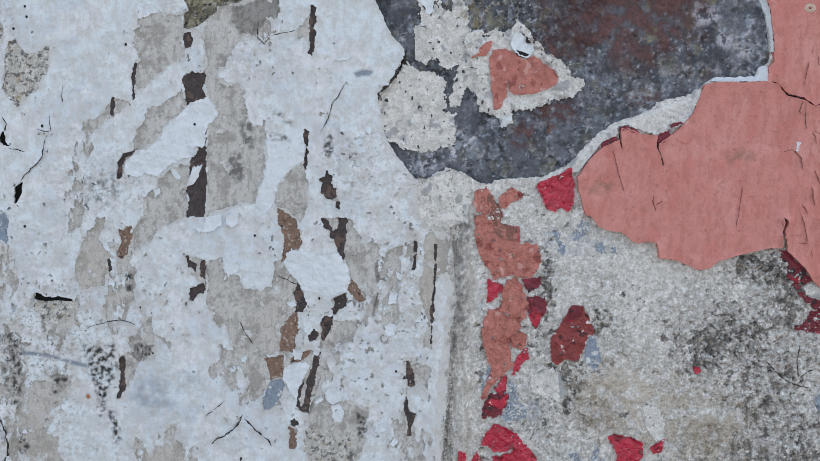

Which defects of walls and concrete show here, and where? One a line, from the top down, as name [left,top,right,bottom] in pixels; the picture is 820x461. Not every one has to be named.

spalling [0,21,49,107]
crack [774,49,819,138]
peeling [0,210,25,300]
peeling [34,0,452,461]
spalling [375,0,774,461]
peeling [779,250,820,334]
crack [782,149,820,256]
peeling [0,326,72,461]